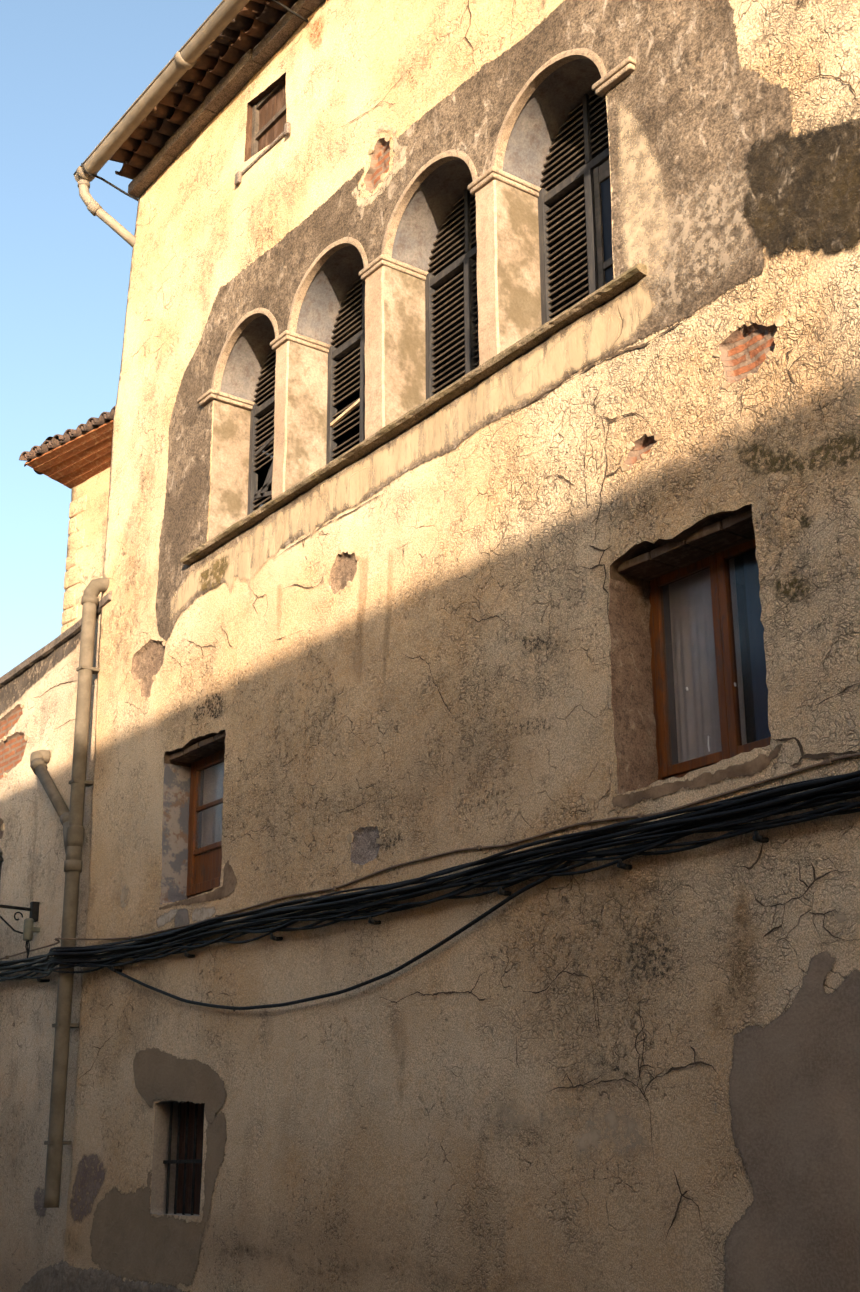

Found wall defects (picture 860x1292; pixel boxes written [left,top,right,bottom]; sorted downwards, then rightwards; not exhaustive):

crack [798,57,860,103]
spalling [352,123,407,209]
damp [171,113,860,613]
spalling [713,315,785,389]
crack [492,292,723,619]
spalling [621,431,663,471]
spalling [326,550,360,594]
spalling [128,639,166,701]
spalling [0,704,29,779]
crack [772,737,859,766]
crack [739,843,860,941]
crack [547,999,718,1237]